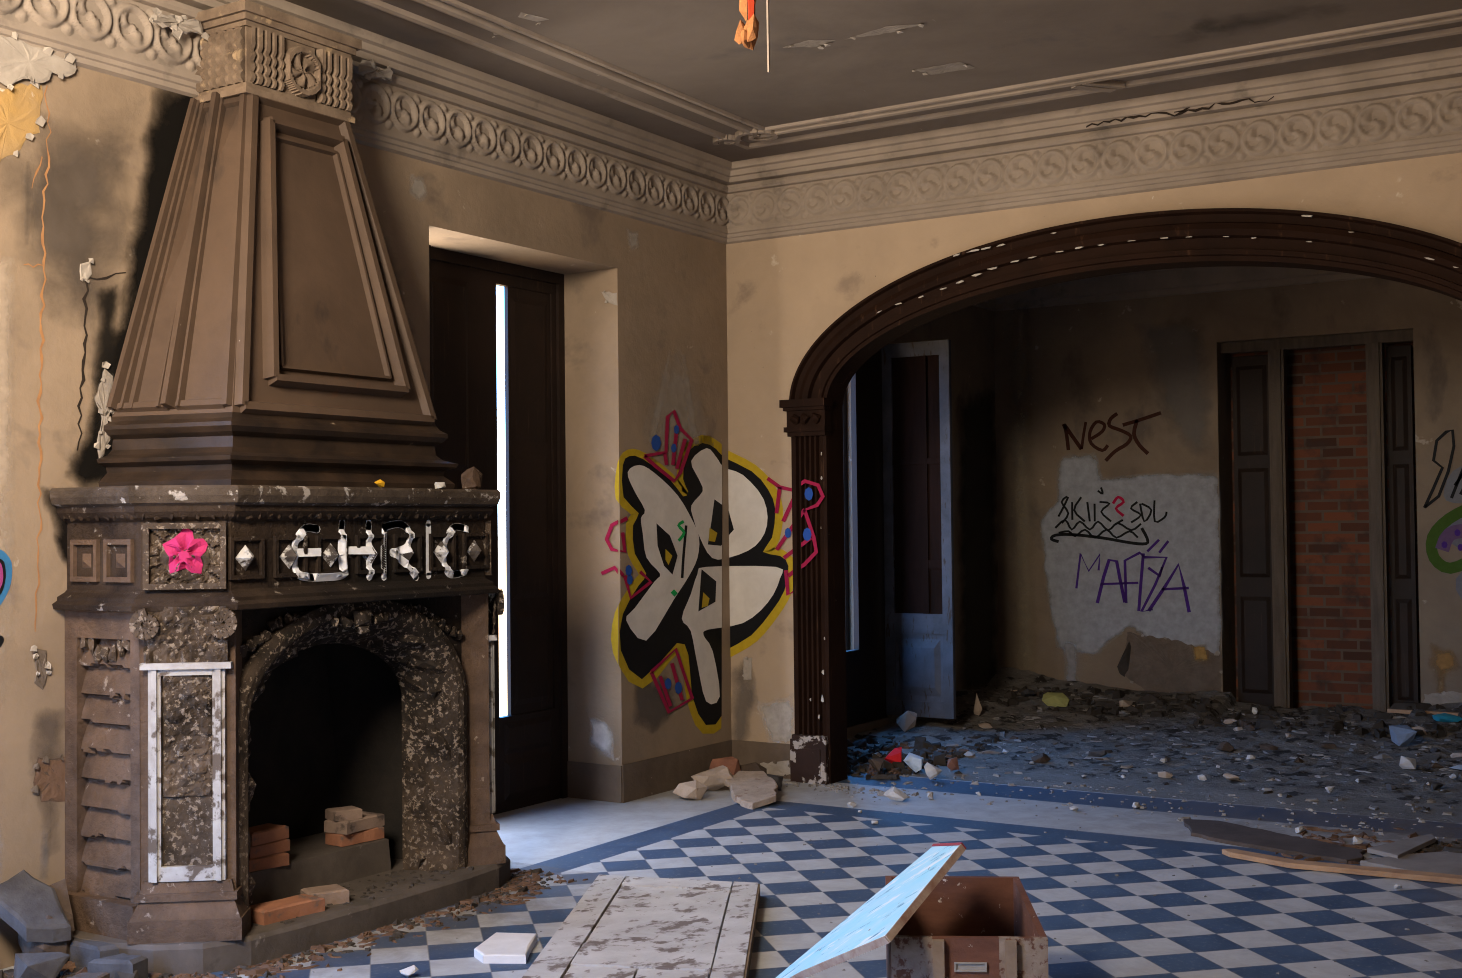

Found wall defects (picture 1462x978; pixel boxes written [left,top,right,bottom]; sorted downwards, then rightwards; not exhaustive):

crack [1086,96,1274,128]
spalling [1125,632,1223,693]